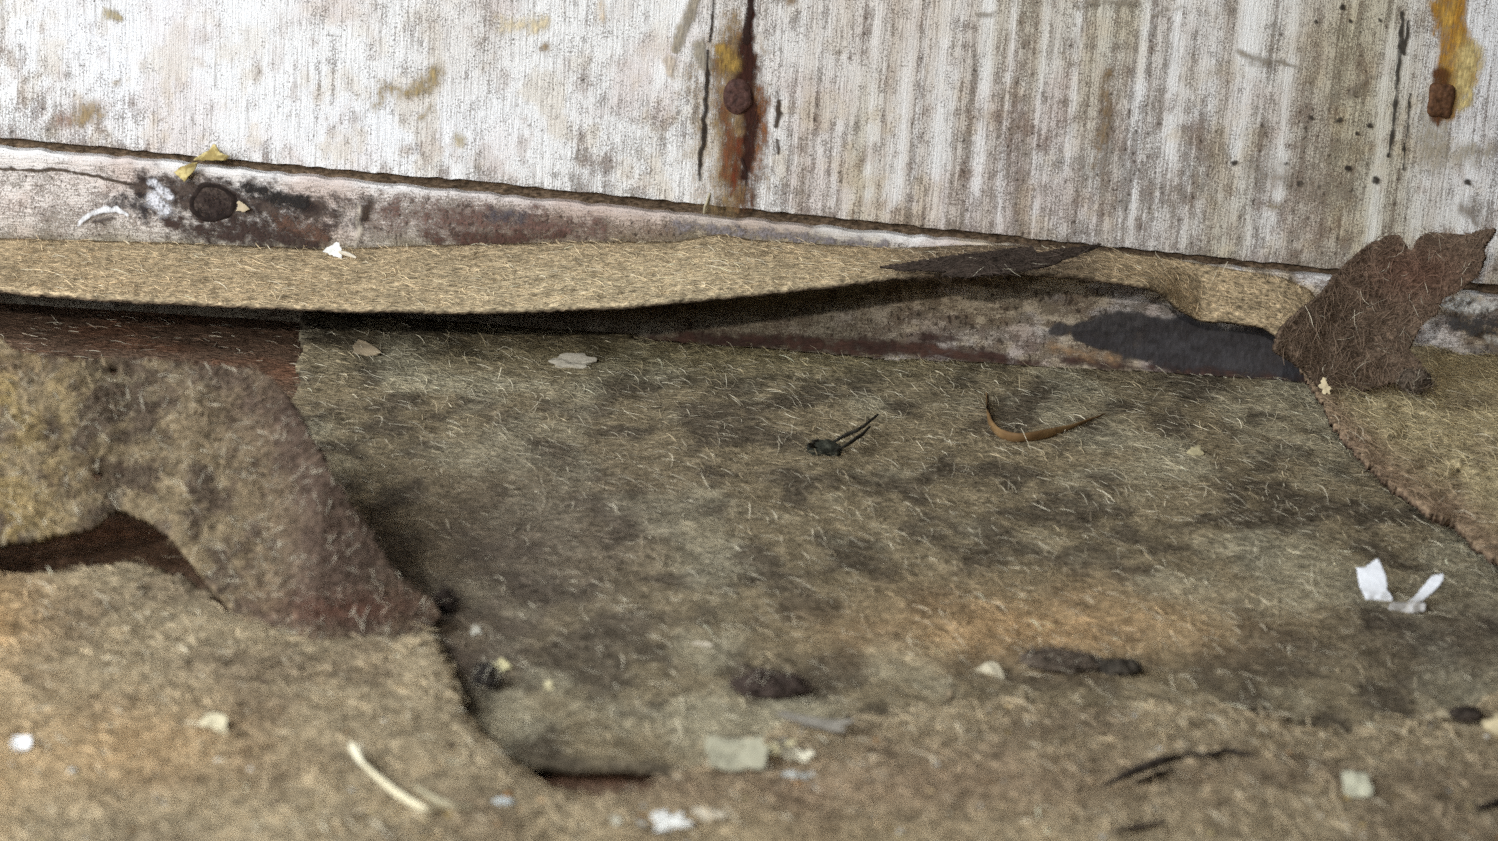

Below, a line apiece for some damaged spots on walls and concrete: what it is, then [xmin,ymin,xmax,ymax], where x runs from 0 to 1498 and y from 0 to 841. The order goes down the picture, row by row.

rust [1419,0,1490,160]
rust [697,9,770,212]
peeling [1441,296,1498,344]
peeling [647,331,1039,365]
peeling [1051,346,1331,395]